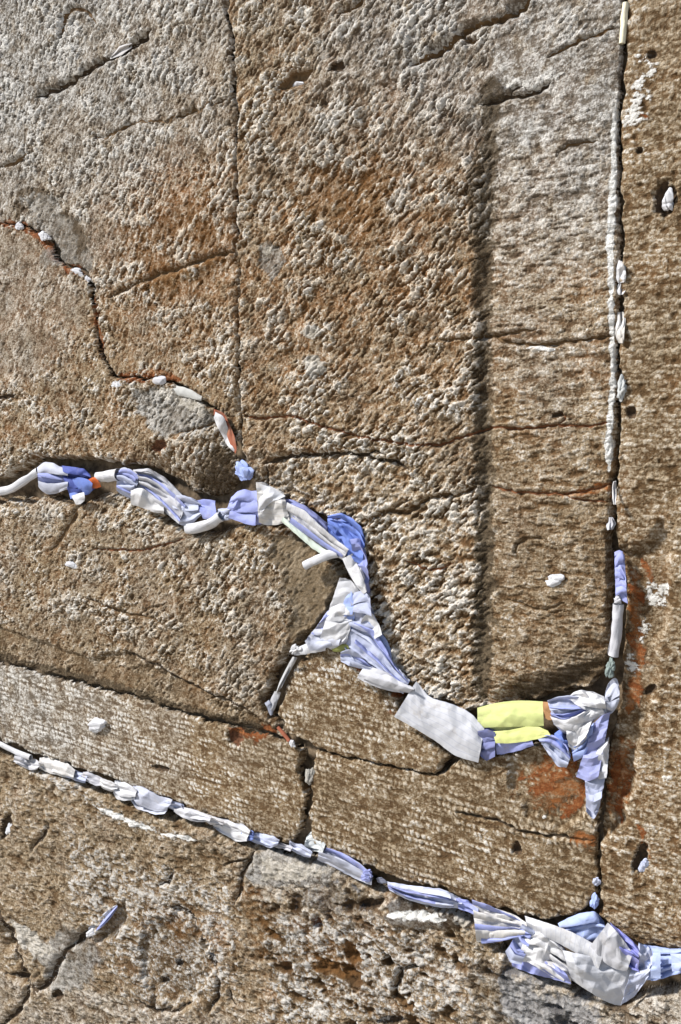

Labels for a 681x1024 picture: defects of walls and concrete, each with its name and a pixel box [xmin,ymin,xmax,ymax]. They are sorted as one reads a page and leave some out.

crack [37,28,152,98]
crack [480,28,615,106]
crack [114,251,234,297]
crack [246,413,611,485]
crack [364,483,613,527]
crack [458,812,596,840]
crack [0,910,89,1024]